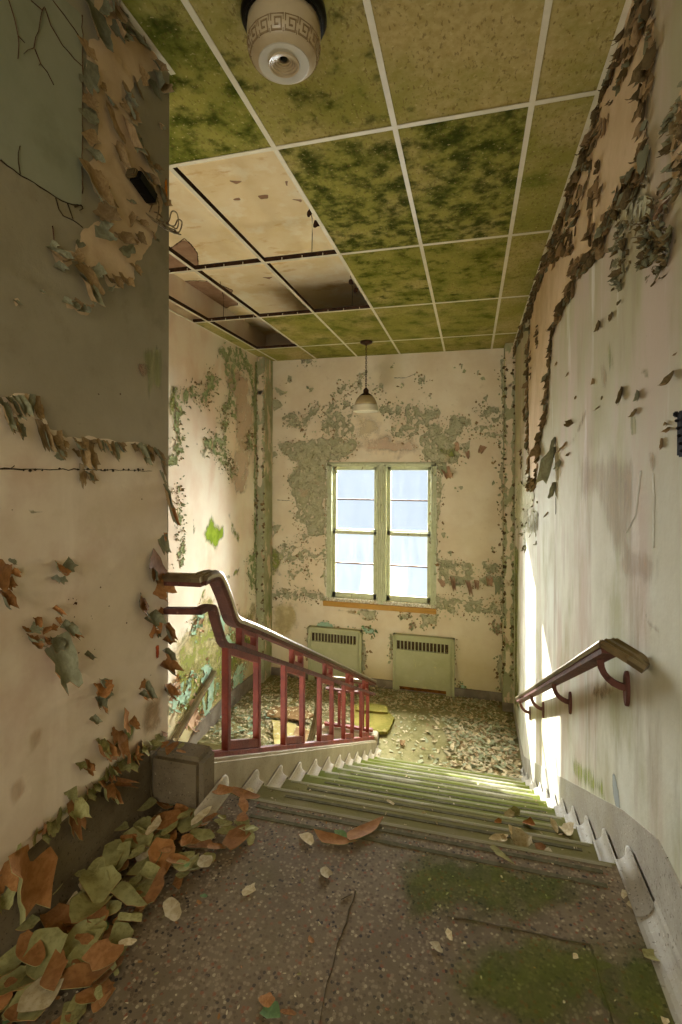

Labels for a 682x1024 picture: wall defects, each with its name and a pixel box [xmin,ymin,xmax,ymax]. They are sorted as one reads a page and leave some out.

crack [0,0,83,241]
peeling [46,0,199,316]
spalling [185,280,238,308]
peeling [272,0,682,692]
crack [0,464,145,472]
peeling [0,342,273,925]
peeling [231,658,523,779]